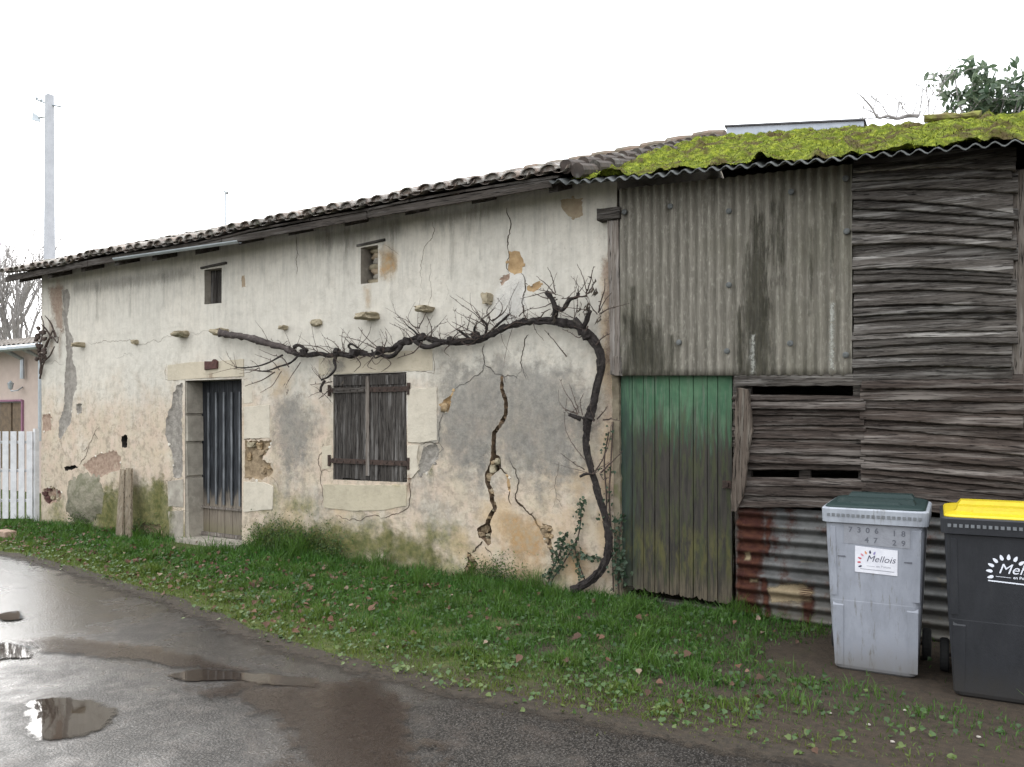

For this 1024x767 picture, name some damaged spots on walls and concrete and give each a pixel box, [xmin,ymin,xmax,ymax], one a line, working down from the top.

flaking render [499,251,525,286]
crack [506,209,528,309]
leakage [737,204,785,374]
spalling [42,289,82,440]
spalling [42,486,62,504]
spalling [64,434,128,477]
spalling [165,383,183,479]
spalling [244,440,273,482]
spalling [417,444,440,477]
crack [498,461,561,564]
corrosion [736,512,772,619]
corrosion [800,587,815,624]